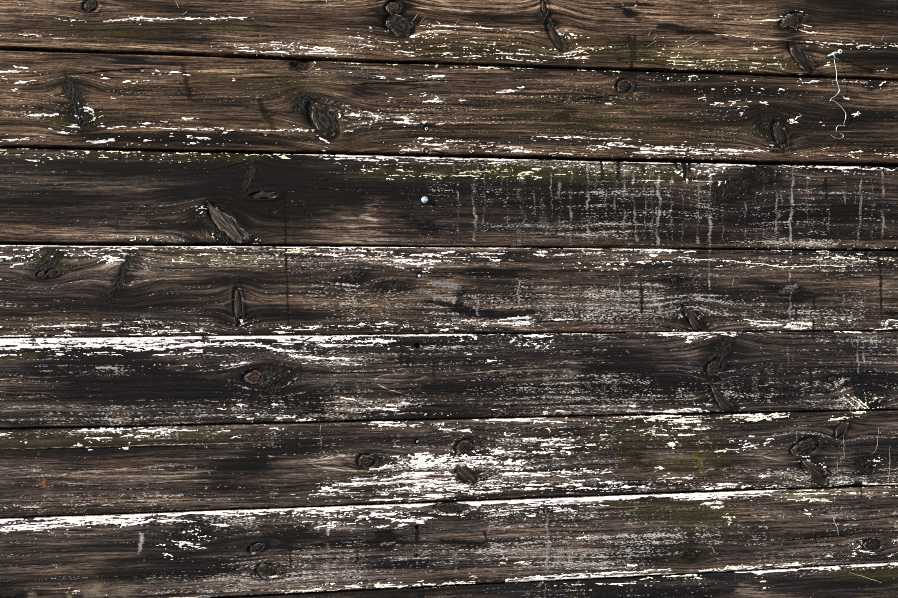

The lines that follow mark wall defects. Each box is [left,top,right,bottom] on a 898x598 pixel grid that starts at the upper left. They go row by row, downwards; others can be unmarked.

peeling [103,12,254,25]
peeling [211,22,621,82]
peeling [642,34,786,118]
peeling [0,103,774,186]
water stain [674,163,691,180]
peeling [0,234,898,273]
peeling [0,316,588,369]
peeling [627,318,898,343]
peeling [828,387,879,421]
peeling [0,396,898,560]
peeling [282,576,478,593]
peeling [505,539,898,591]